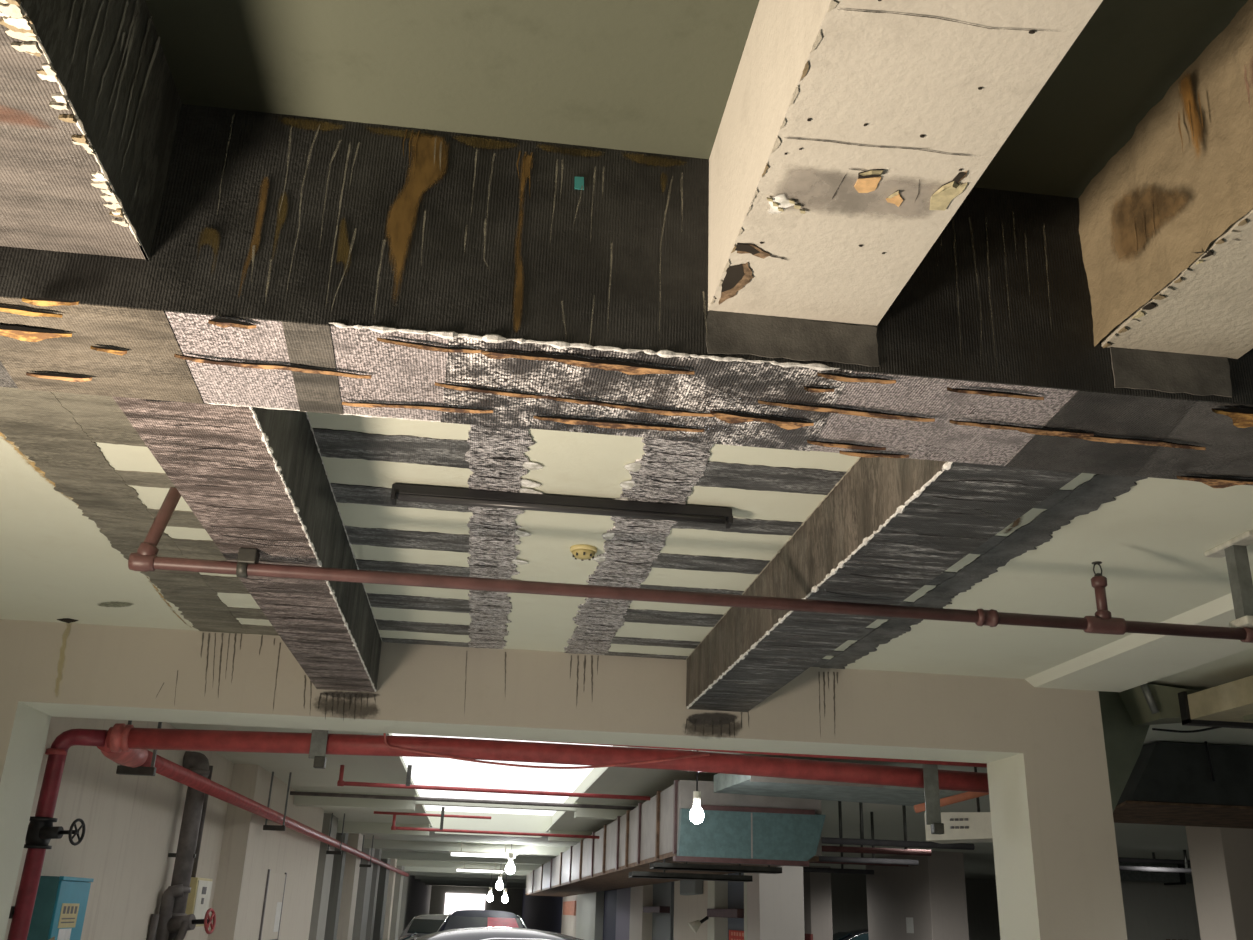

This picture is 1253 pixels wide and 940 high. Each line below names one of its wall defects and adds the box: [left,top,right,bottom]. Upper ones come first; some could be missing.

spalling [0,0,96,155]
spalling [91,171,129,227]
water stain [279,118,360,310]
corrosion [386,129,448,293]
water stain [455,136,518,268]
water stain [538,145,604,242]
water stain [624,154,685,335]
spalling [711,31,822,304]
peeling [854,169,903,207]
peeling [930,169,967,211]
water stain [201,633,242,695]
water stain [570,655,599,706]